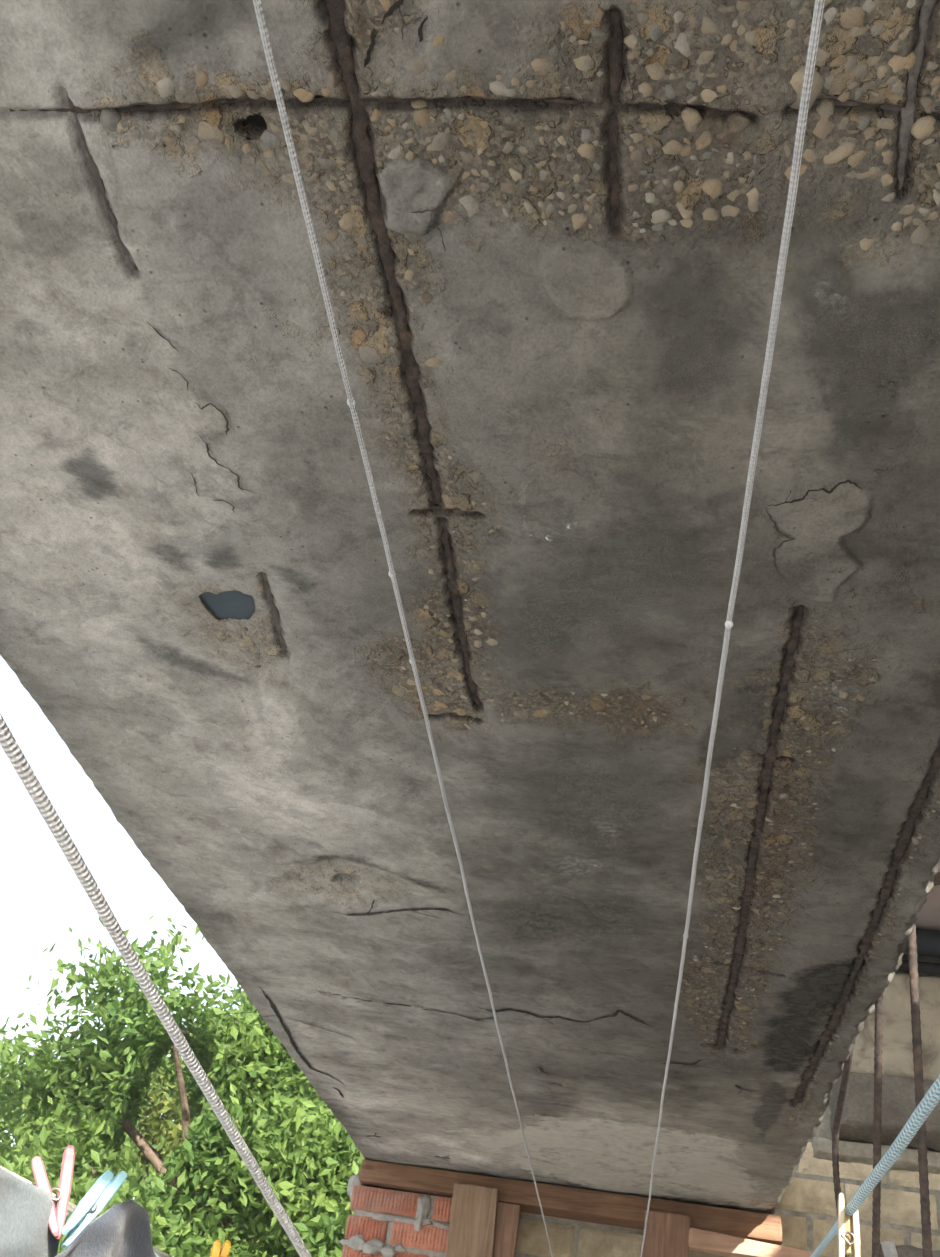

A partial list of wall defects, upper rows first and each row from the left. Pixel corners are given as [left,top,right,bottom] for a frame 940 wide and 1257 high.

crack [364,0,428,67]
crack [147,321,256,512]
spalling [0,0,940,743]
damp [793,268,940,457]
spalling [650,478,916,1062]
spalling [258,854,443,912]
crack [209,989,355,1098]
crack [422,1007,648,1025]